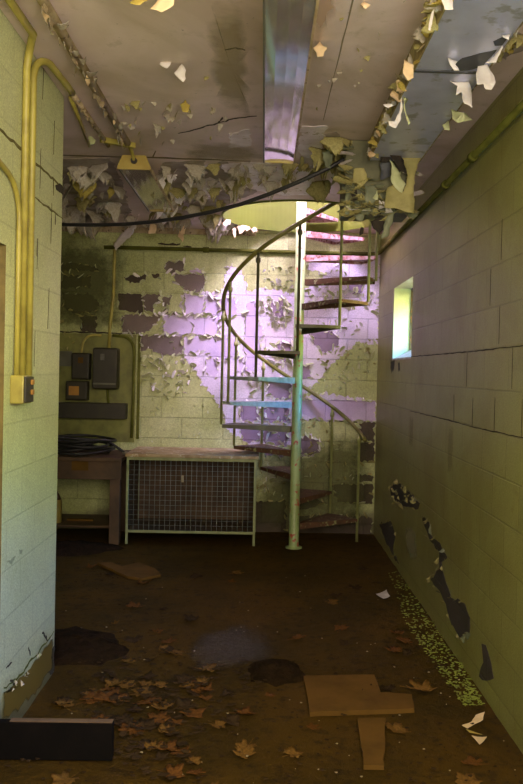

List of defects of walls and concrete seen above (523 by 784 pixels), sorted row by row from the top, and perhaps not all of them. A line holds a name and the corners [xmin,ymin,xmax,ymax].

peeling [41,4,156,149]
crack [147,151,250,162]
crack [178,116,256,134]
peeling [62,0,523,250]
peeling [117,251,399,564]
peeling [388,479,470,643]
peeling [4,631,54,691]
peeling [479,644,494,681]